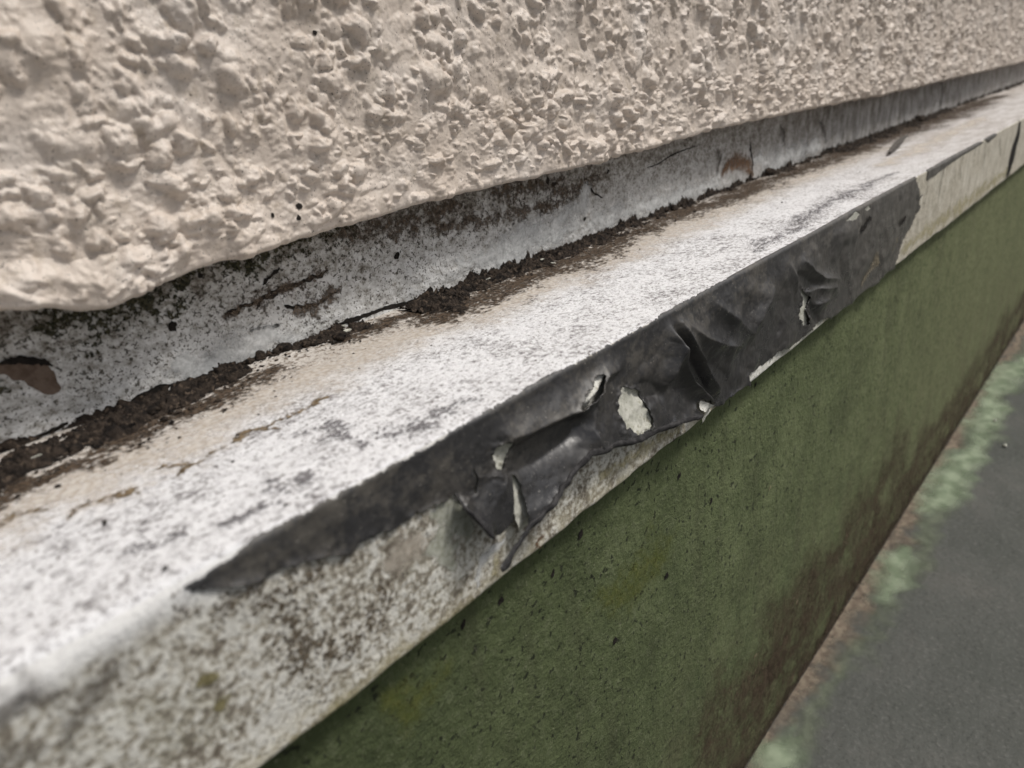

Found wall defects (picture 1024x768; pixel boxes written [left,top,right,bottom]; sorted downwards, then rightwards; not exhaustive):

damp [0,117,986,532]
peeling [184,133,997,592]
damp [744,320,1024,768]